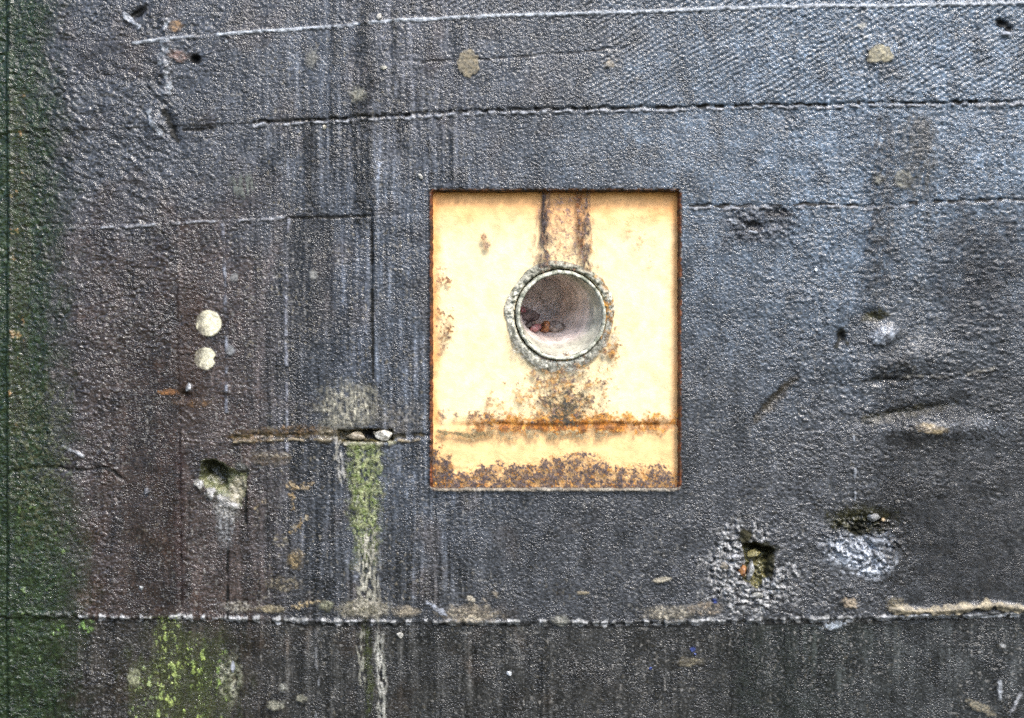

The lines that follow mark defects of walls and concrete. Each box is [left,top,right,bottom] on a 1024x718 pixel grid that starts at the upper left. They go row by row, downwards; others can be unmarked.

corrosion [429,188,683,491]
hole [194,459,250,545]
spalling [697,516,798,615]
spalling [826,500,906,581]